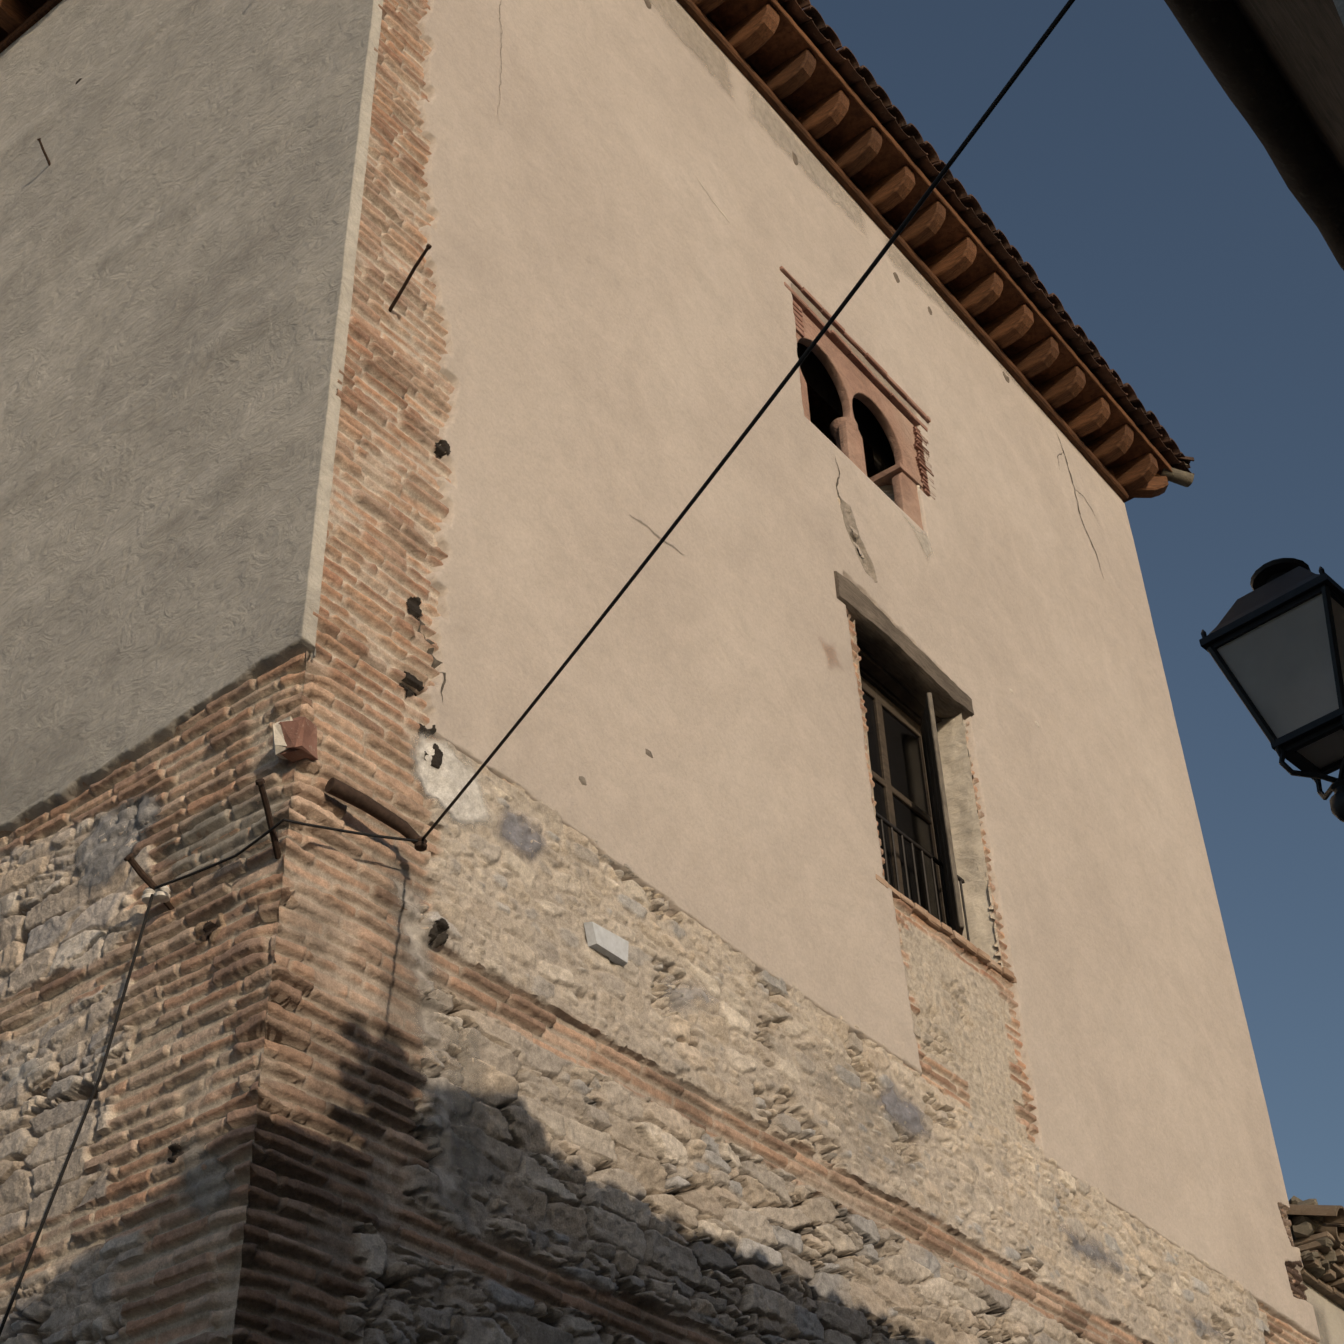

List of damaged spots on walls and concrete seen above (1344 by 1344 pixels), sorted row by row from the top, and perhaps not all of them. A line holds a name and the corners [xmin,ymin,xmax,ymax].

crack [497,0,505,125]
flaking render [644,0,730,94]
flaking render [752,95,862,226]
flaking render [890,245,976,340]
spalling [434,440,451,458]
flaking render [835,457,878,583]
crack [1057,437,1104,579]
spalling [406,596,423,618]
spalling [399,671,424,698]
spalling [418,724,436,738]